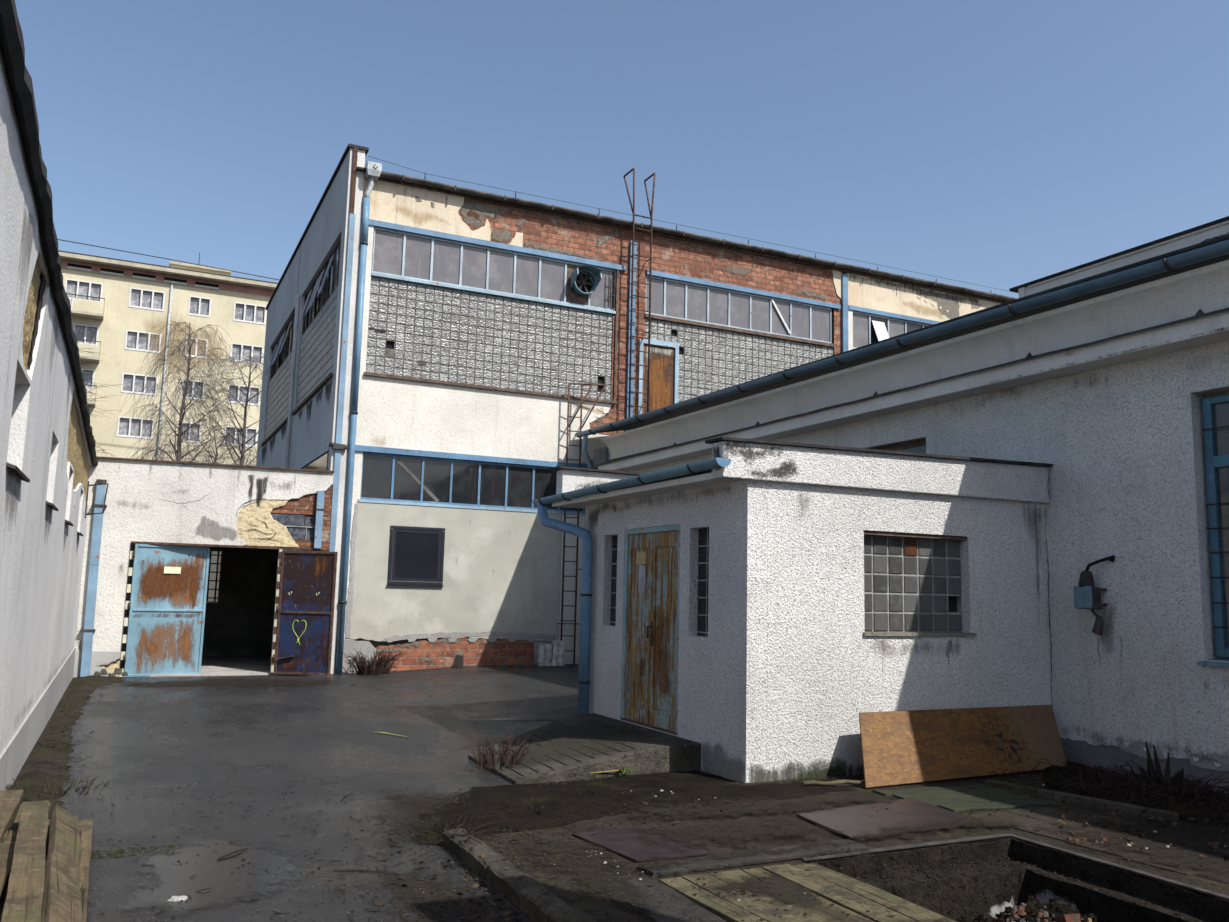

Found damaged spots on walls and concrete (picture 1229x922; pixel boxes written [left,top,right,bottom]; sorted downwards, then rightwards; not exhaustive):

flaking render [458,197,841,436]
spalling [197,484,333,549]
rust [136,554,204,671]
flaking render [371,631,556,671]
flaking render [1119,741,1166,760]
flaking render [1187,753,1229,771]
spalling [801,833,1229,922]